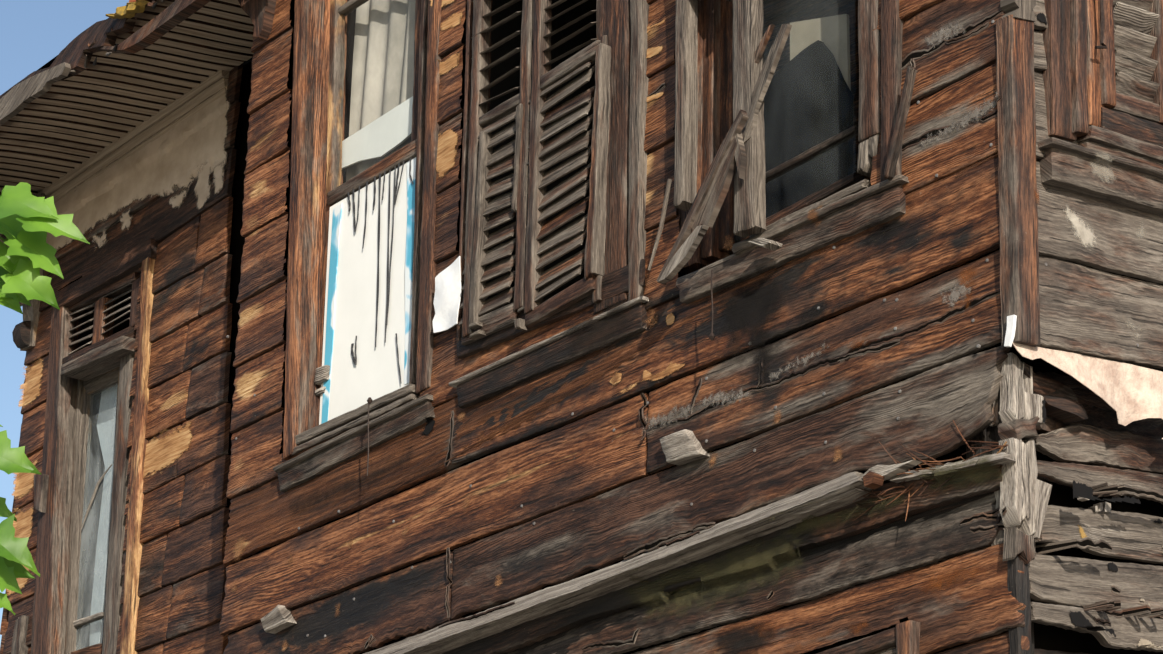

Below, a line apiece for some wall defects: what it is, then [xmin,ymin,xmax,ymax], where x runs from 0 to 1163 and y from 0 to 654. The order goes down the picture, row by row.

crack [901,9,1003,70]
peeling [46,85,229,250]
crack [638,289,1000,440]
peeling [1004,315,1163,426]
spalling [143,421,192,480]
spalling [6,555,32,595]
spalling [12,459,37,538]
crack [960,502,1007,534]
crack [1035,537,1112,554]
crack [1091,483,1163,501]
crack [1083,585,1163,627]
peeling [1137,639,1163,648]